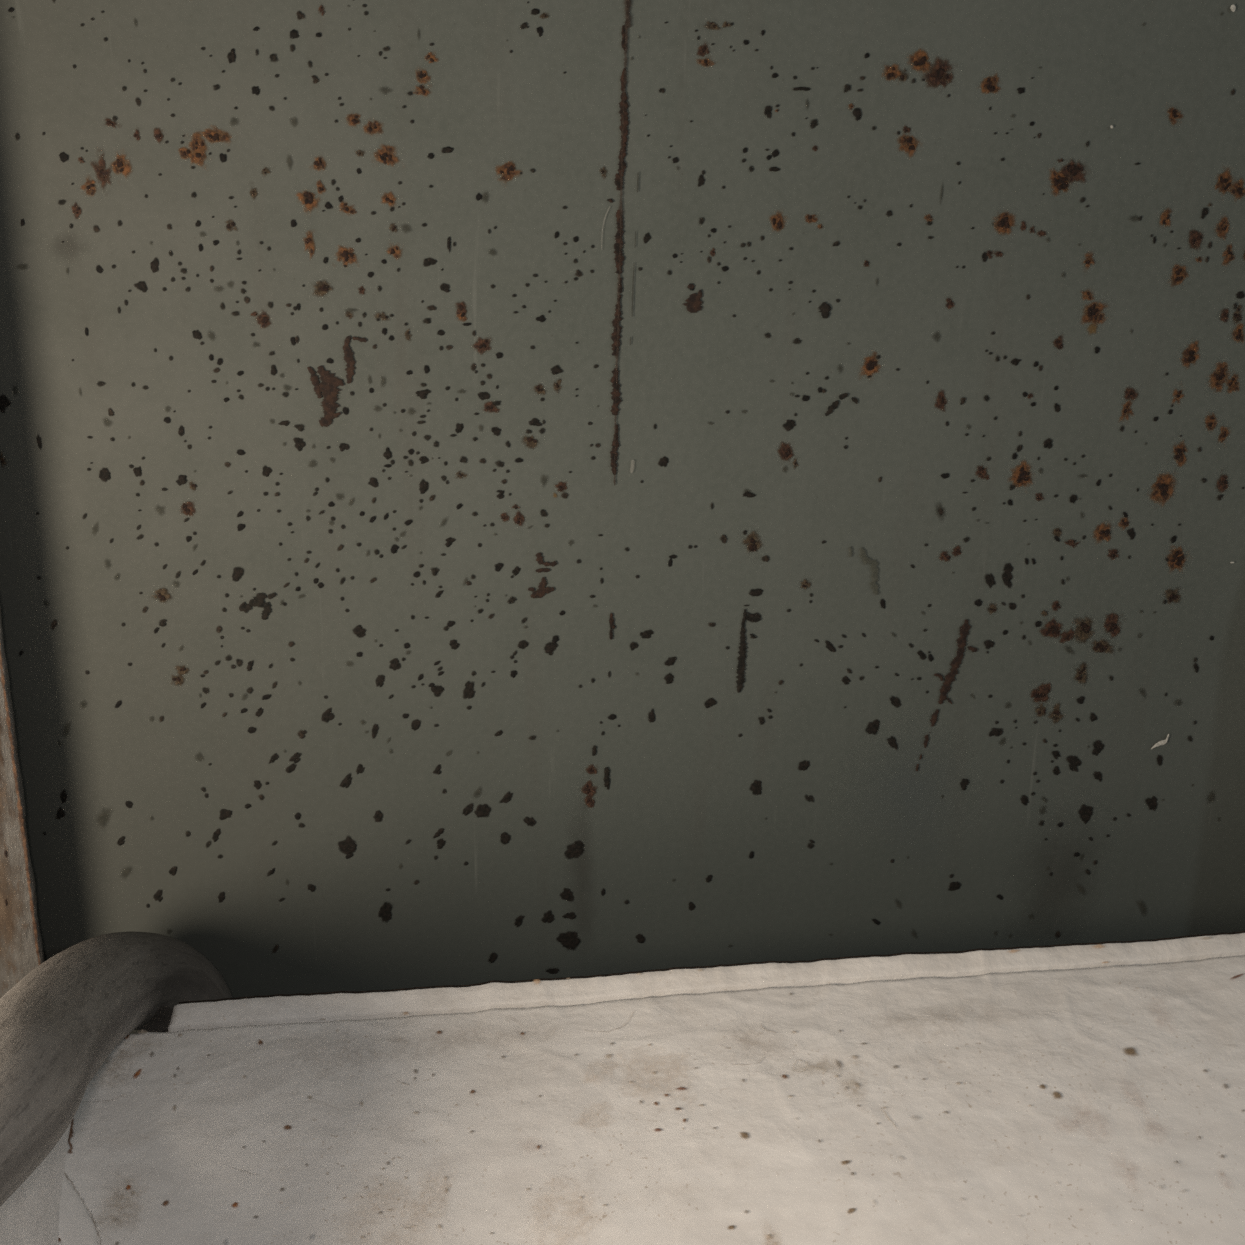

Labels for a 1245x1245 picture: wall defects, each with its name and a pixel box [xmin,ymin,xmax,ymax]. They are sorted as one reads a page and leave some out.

corrosion [884,50,953,86]
corrosion [600,0,631,486]
peeling [192,330,299,402]
corrosion [307,336,367,427]
peeling [129,457,294,733]
peeling [225,352,559,730]
corrosion [736,609,761,693]
corrosion [916,619,977,771]
peeling [974,544,1042,654]
corrosion [1040,601,1120,652]
peeling [186,696,341,858]
peeling [971,695,1164,875]